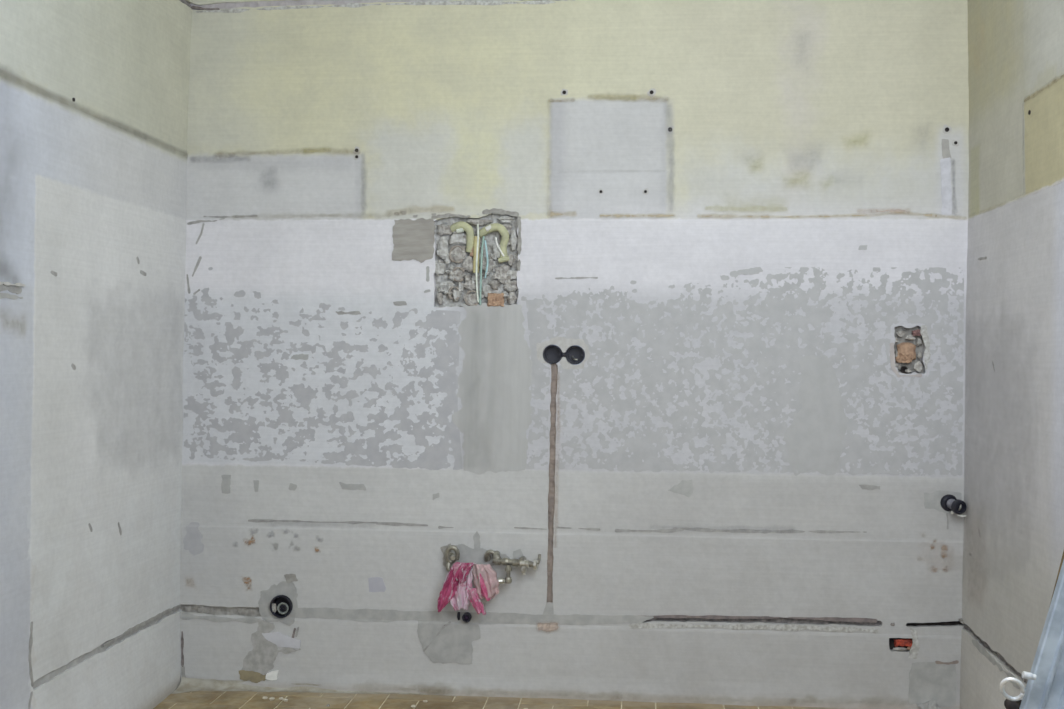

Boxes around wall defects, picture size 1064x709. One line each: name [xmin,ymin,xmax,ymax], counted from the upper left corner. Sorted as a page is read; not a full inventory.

flaking render [184,208,964,497]
flaking render [239,574,301,683]